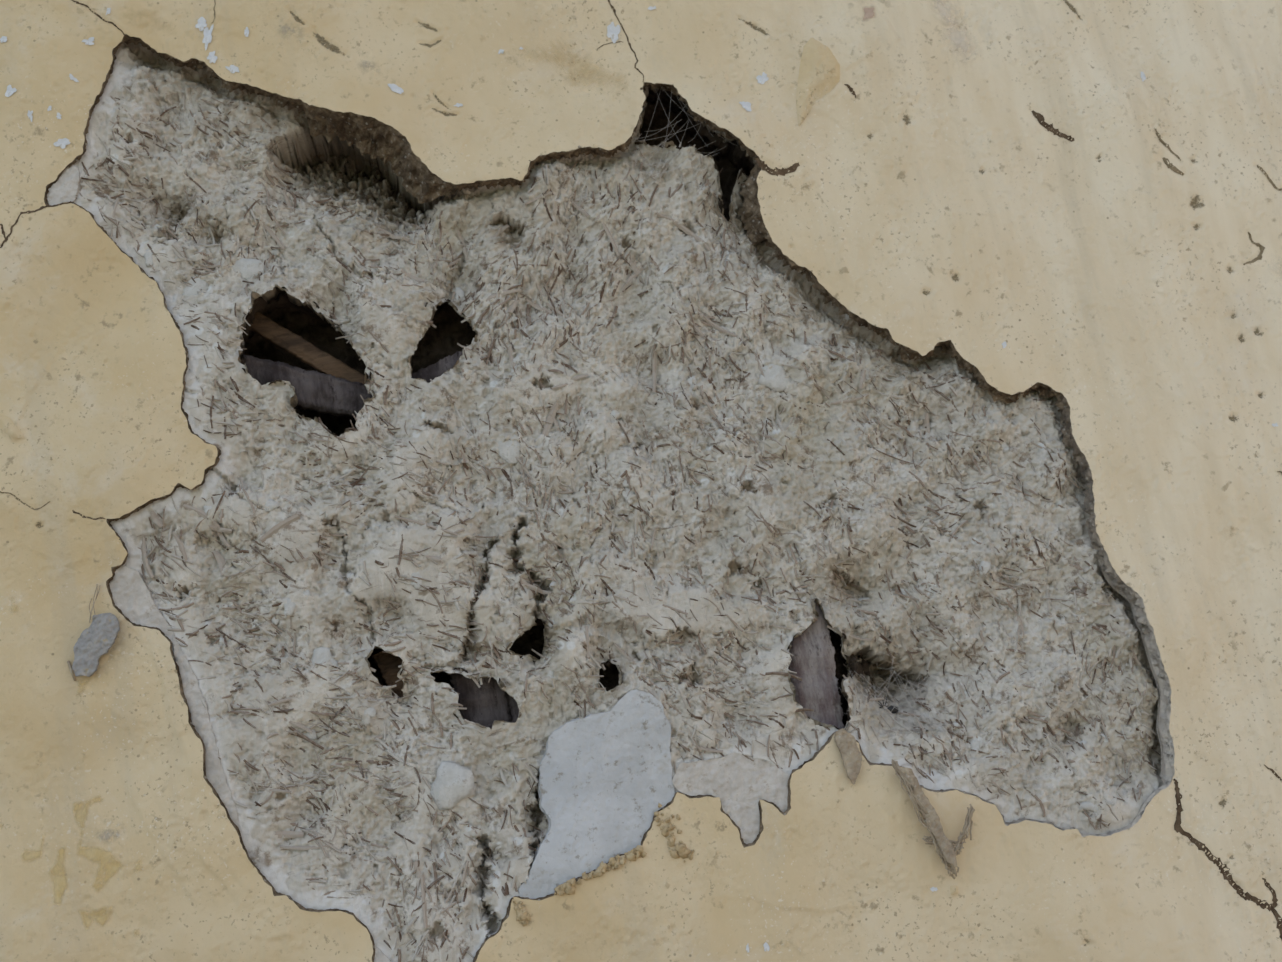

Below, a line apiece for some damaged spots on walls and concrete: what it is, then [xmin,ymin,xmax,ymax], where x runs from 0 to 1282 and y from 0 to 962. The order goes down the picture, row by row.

crack [72,0,125,35]
peeling [195,17,213,51]
spalling [290,11,344,55]
peeling [607,22,620,43]
crack [597,0,644,83]
crack [0,201,88,248]
crack [0,491,105,520]
flaking render [67,584,120,681]
flaking render [834,728,862,784]
flaking render [891,759,975,879]
crack [1173,779,1282,939]